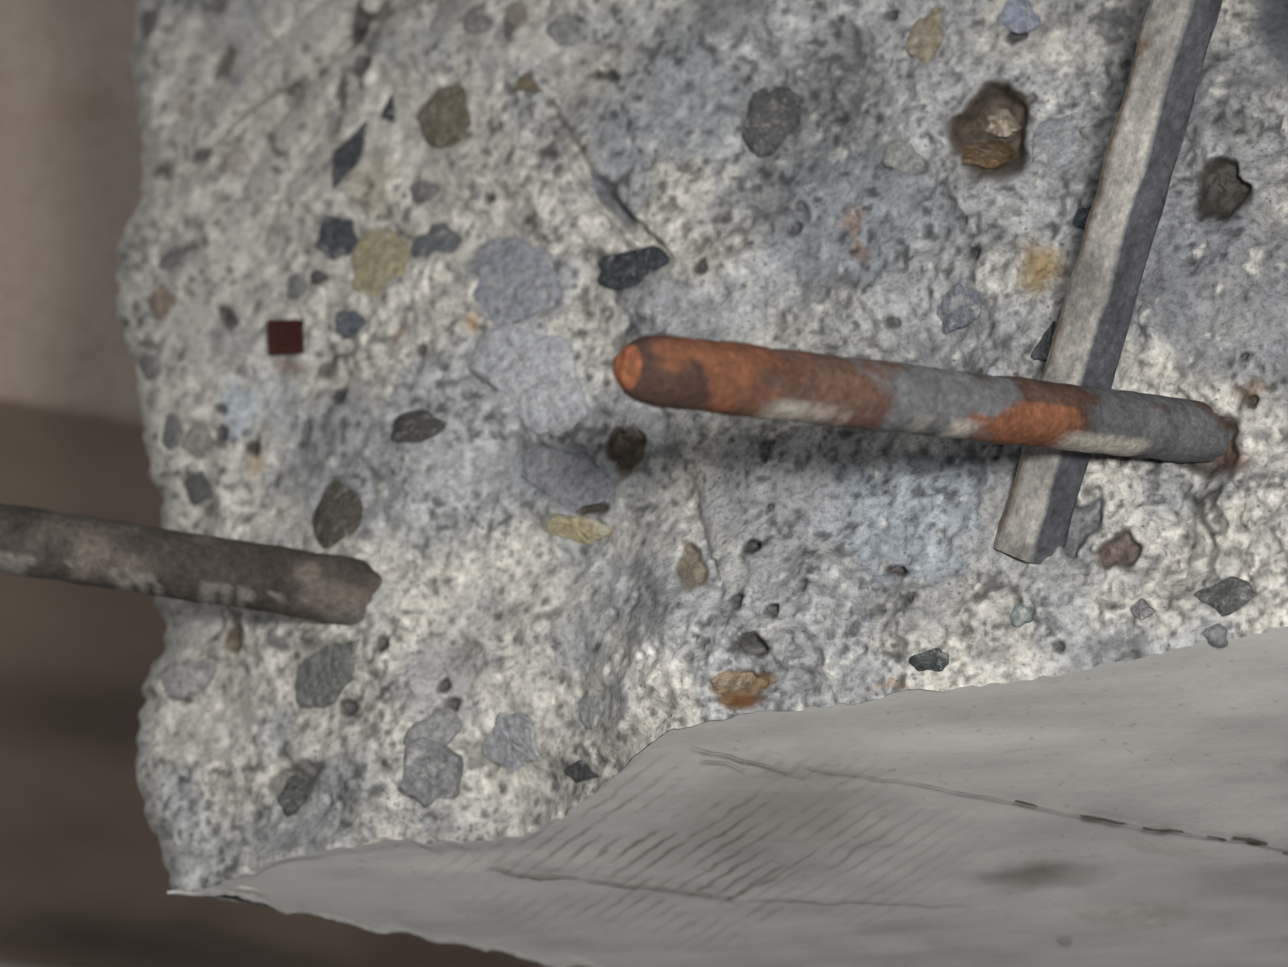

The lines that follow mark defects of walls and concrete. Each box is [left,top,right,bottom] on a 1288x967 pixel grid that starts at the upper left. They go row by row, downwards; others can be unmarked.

spalling [1031,111,1084,171]
spalling [352,227,410,297]
spalling [473,237,563,326]
spalling [470,322,587,436]
spalling [520,443,615,512]
corrosion [1224,441,1241,468]
spalling [545,514,615,545]
spalling [160,658,217,701]
spalling [155,596,225,665]
spalling [909,647,949,672]
spalling [1194,576,1256,617]
crack [691,745,1288,854]